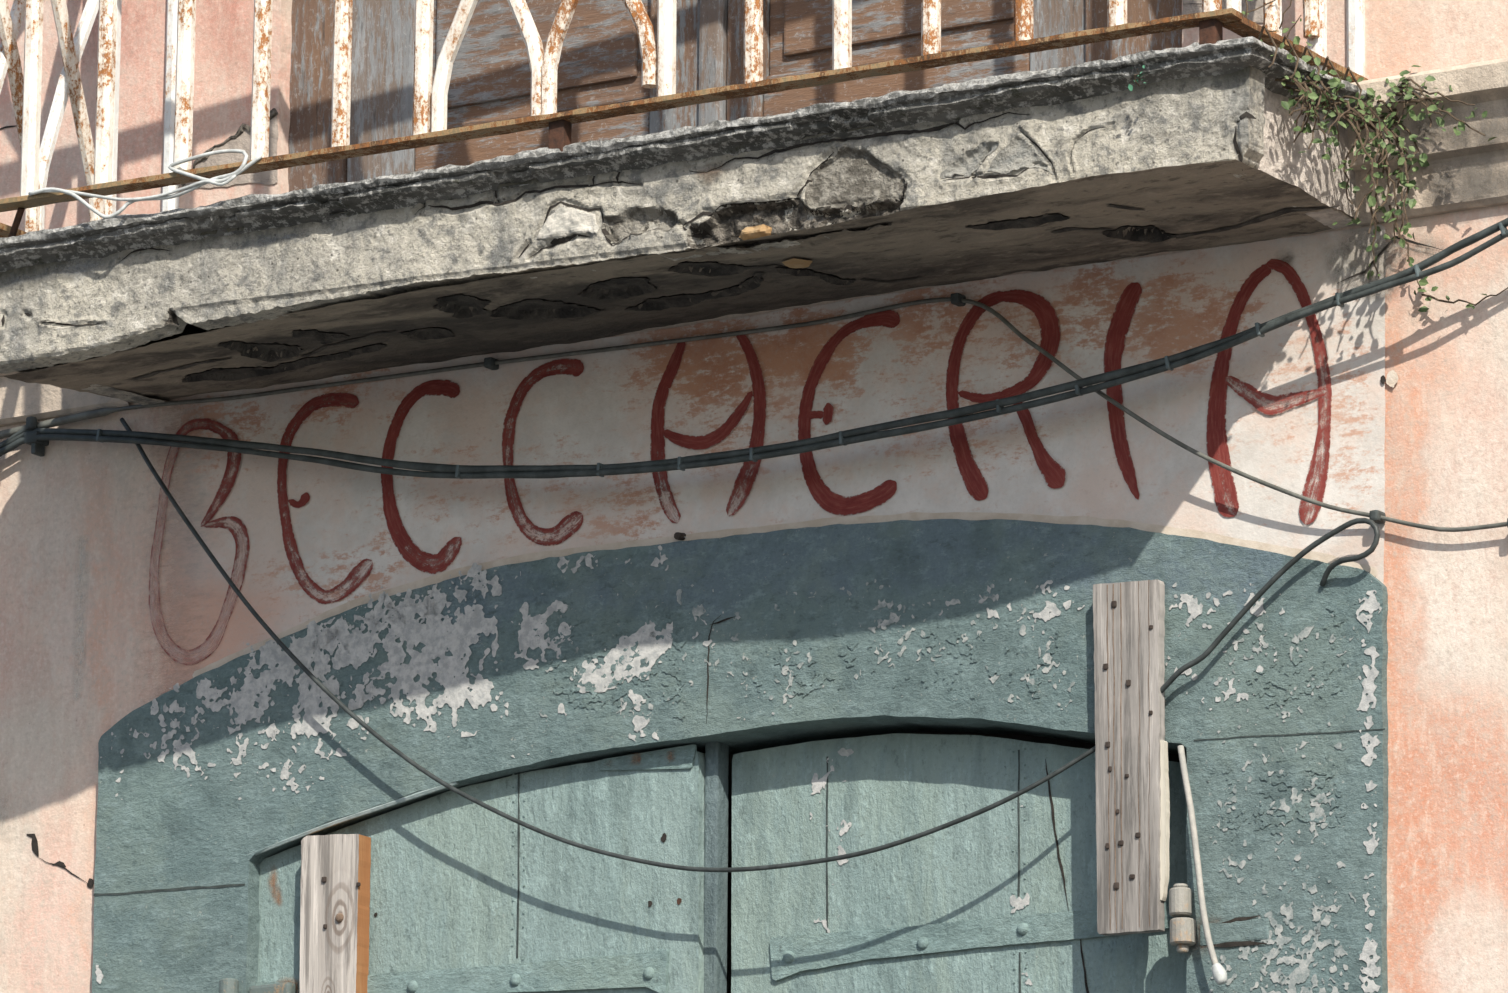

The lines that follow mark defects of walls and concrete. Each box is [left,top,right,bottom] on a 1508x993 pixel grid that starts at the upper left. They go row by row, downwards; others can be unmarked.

spalling [1222,0,1263,23]
spalling [181,108,278,188]
spalling [940,133,1054,178]
spalling [182,146,906,383]
spalling [965,213,1070,230]
peeling [651,545,669,571]
peeling [100,553,812,800]
crack [706,614,736,724]
peeling [840,578,1085,710]
peeling [1164,581,1382,854]
crack [27,834,87,883]
peeling [1207,722,1381,993]